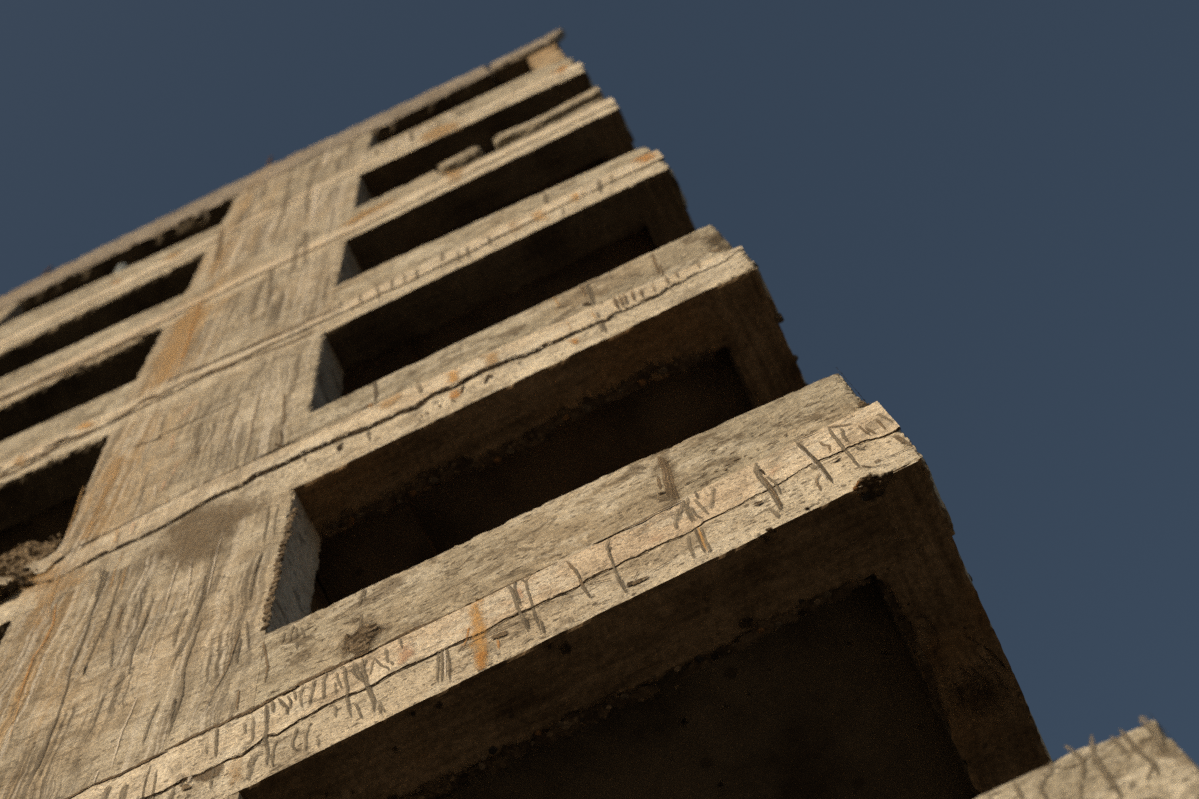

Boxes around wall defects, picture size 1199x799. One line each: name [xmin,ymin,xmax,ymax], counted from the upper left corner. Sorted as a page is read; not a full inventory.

crack [47,253,735,583]
spalling [0,533,65,602]
water stain [33,499,278,775]
crack [140,435,913,799]
water stain [93,771,128,799]
water stain [141,765,157,799]
water stain [205,727,218,788]